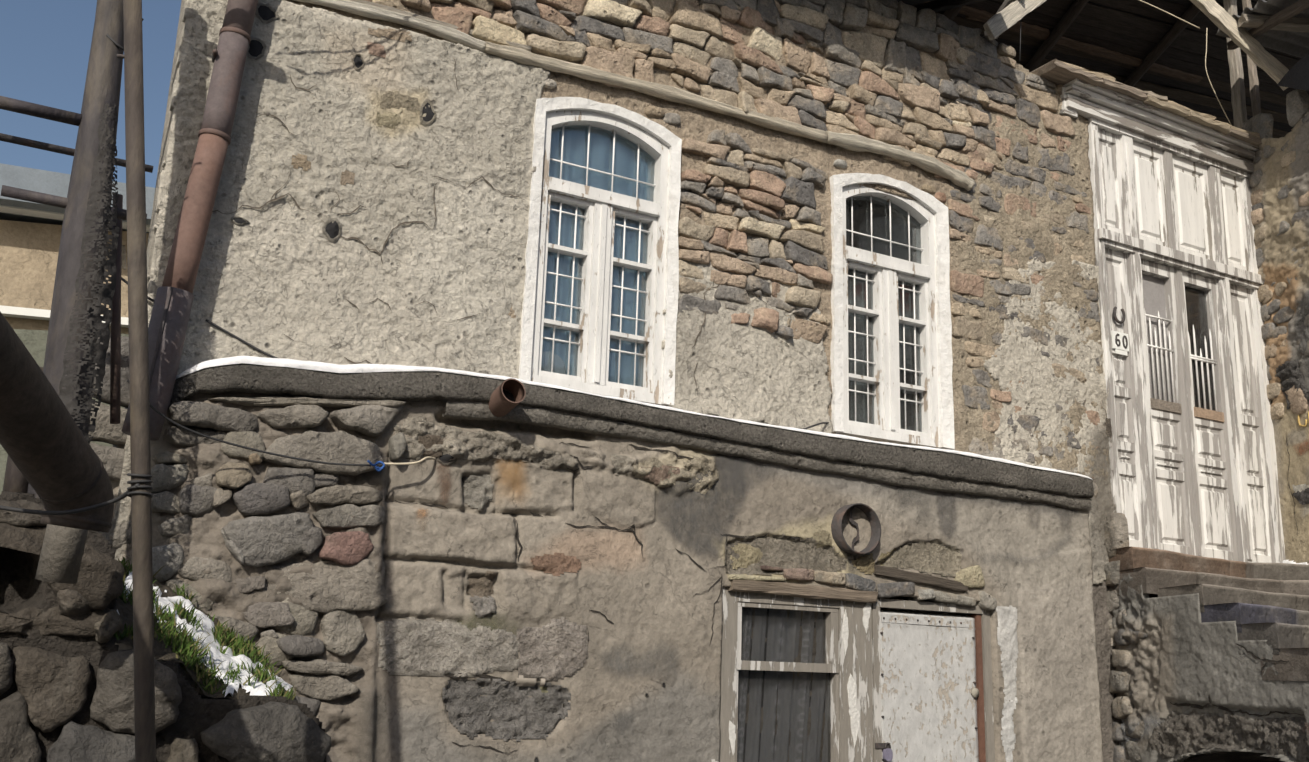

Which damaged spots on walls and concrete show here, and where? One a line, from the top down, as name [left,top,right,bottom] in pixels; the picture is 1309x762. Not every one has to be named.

crack [212,159,526,263]
crack [346,298,483,320]
crack [284,334,372,364]
spalling [1276,360,1309,409]
spalling [531,552,581,576]
crack [498,512,643,562]
damp [661,456,745,553]
crack [675,533,812,643]
spalling [376,571,588,741]
peeling [847,674,860,748]
peeling [842,603,872,655]
peeling [996,605,1018,762]